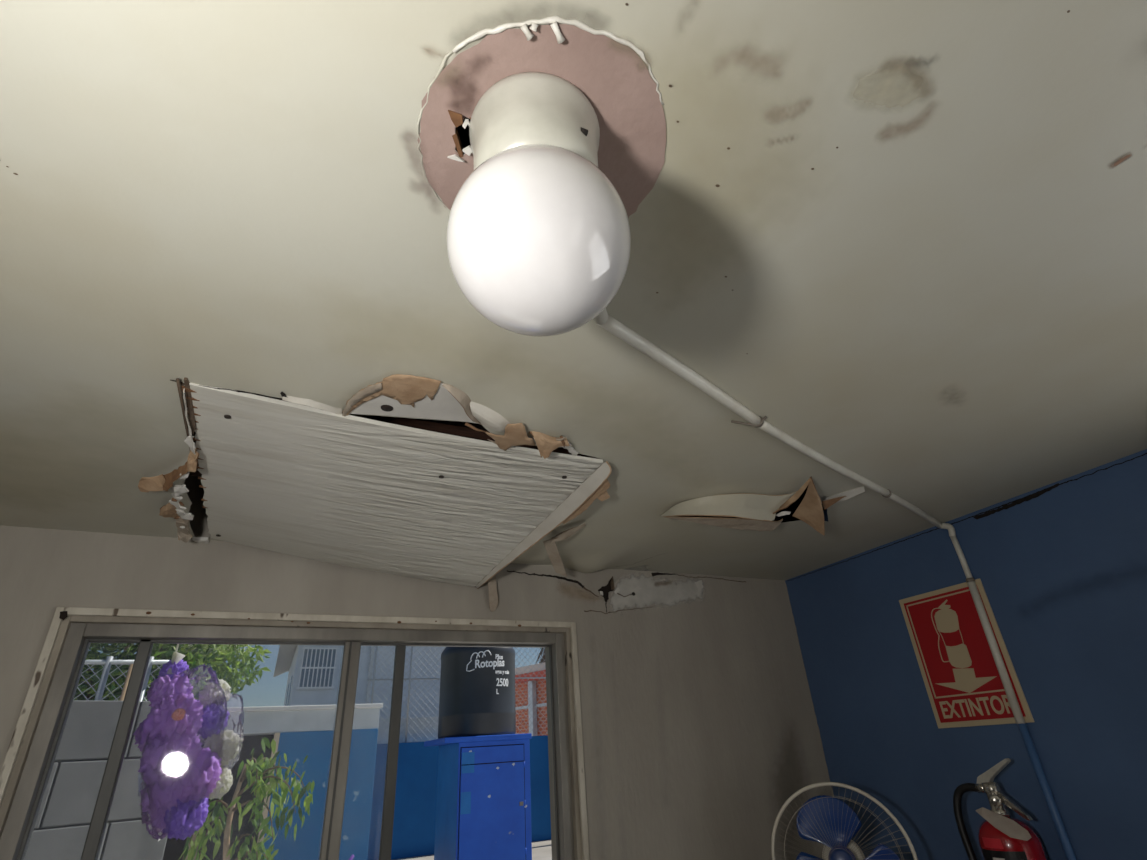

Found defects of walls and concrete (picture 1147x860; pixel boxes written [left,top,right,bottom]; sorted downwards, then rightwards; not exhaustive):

flaking render [417,16,666,218]
peeling [476,462,610,588]
spalling [598,566,704,613]